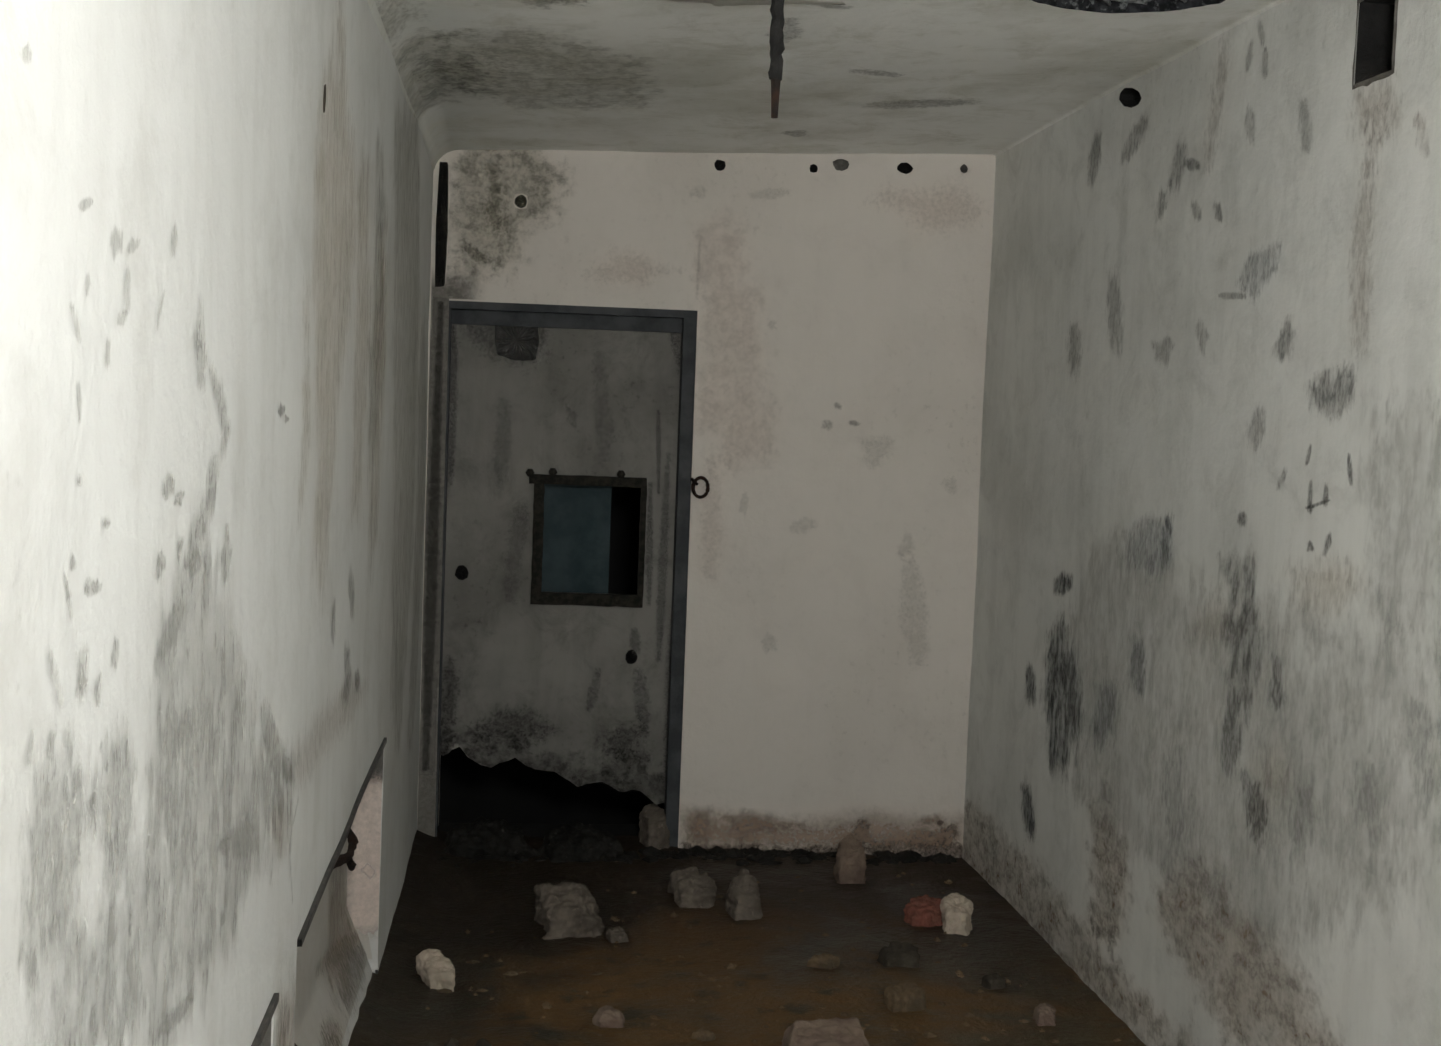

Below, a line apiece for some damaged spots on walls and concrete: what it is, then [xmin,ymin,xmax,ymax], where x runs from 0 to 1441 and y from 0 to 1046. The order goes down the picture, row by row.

spalling [931,0,1245,18]
damp [417,150,563,837]
damp [1055,573,1071,593]
damp [1228,559,1254,677]
damp [1026,622,1081,768]
damp [1020,787,1035,838]
damp [1159,874,1324,1046]